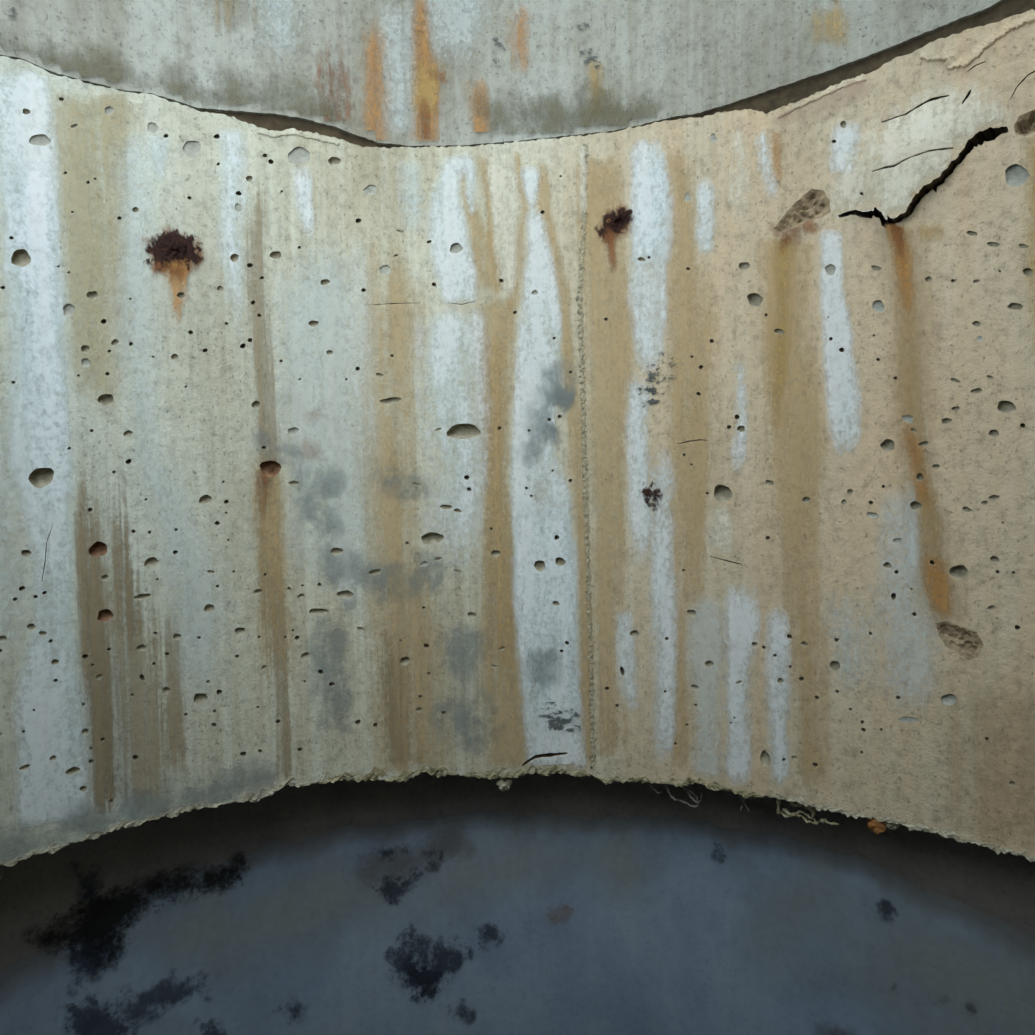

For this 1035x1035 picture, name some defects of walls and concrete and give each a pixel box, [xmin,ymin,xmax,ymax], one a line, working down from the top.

corrosion [415,0,439,139]
crack [882,61,986,123]
peeling [920,9,1035,70]
corrosion [145,229,203,313]
corrosion [596,207,632,264]
spalling [772,189,831,234]
crack [838,126,1008,229]
damp [767,231,860,549]
damp [429,141,713,766]
spalling [936,621,984,660]
damp [28,854,245,980]
damp [386,929,471,1001]